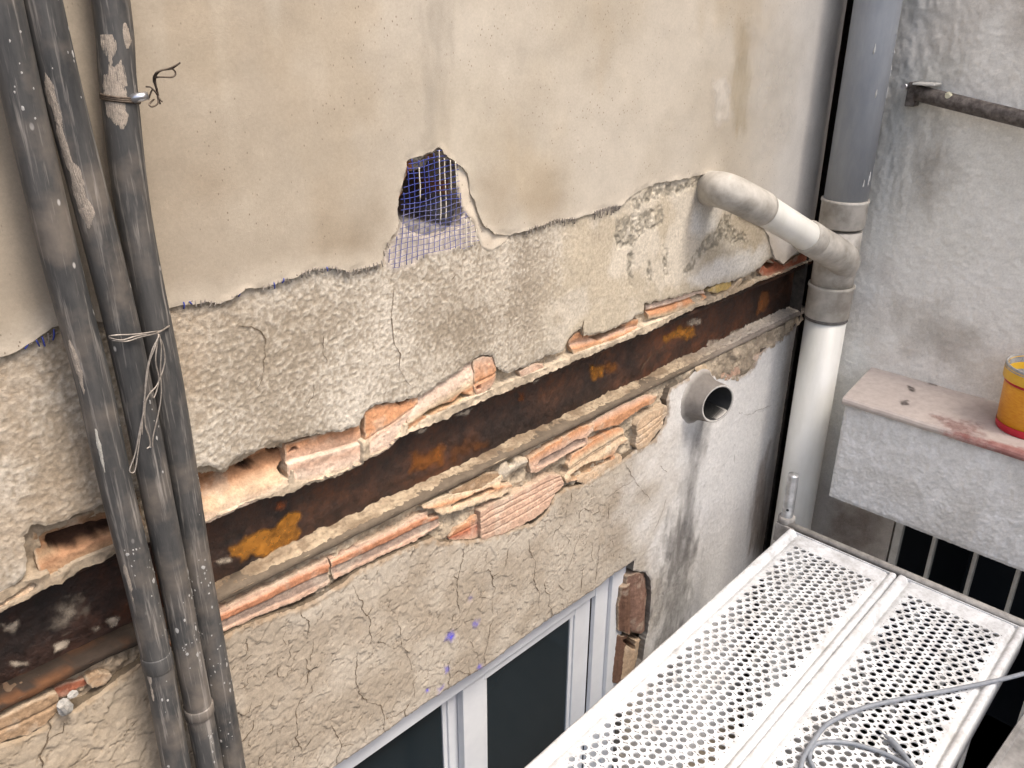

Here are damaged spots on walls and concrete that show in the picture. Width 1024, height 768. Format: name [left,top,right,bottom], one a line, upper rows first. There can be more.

spalling [397,153,509,251]
crack [391,291,411,386]
corrosion [664,326,694,340]
spalling [197,253,812,632]
spalling [0,505,116,613]
corrosion [231,504,301,559]
crack [224,323,797,768]
spalling [612,567,647,684]
water stain [664,524,696,638]
spalling [0,645,140,743]
crack [0,657,162,768]
crack [171,649,196,768]